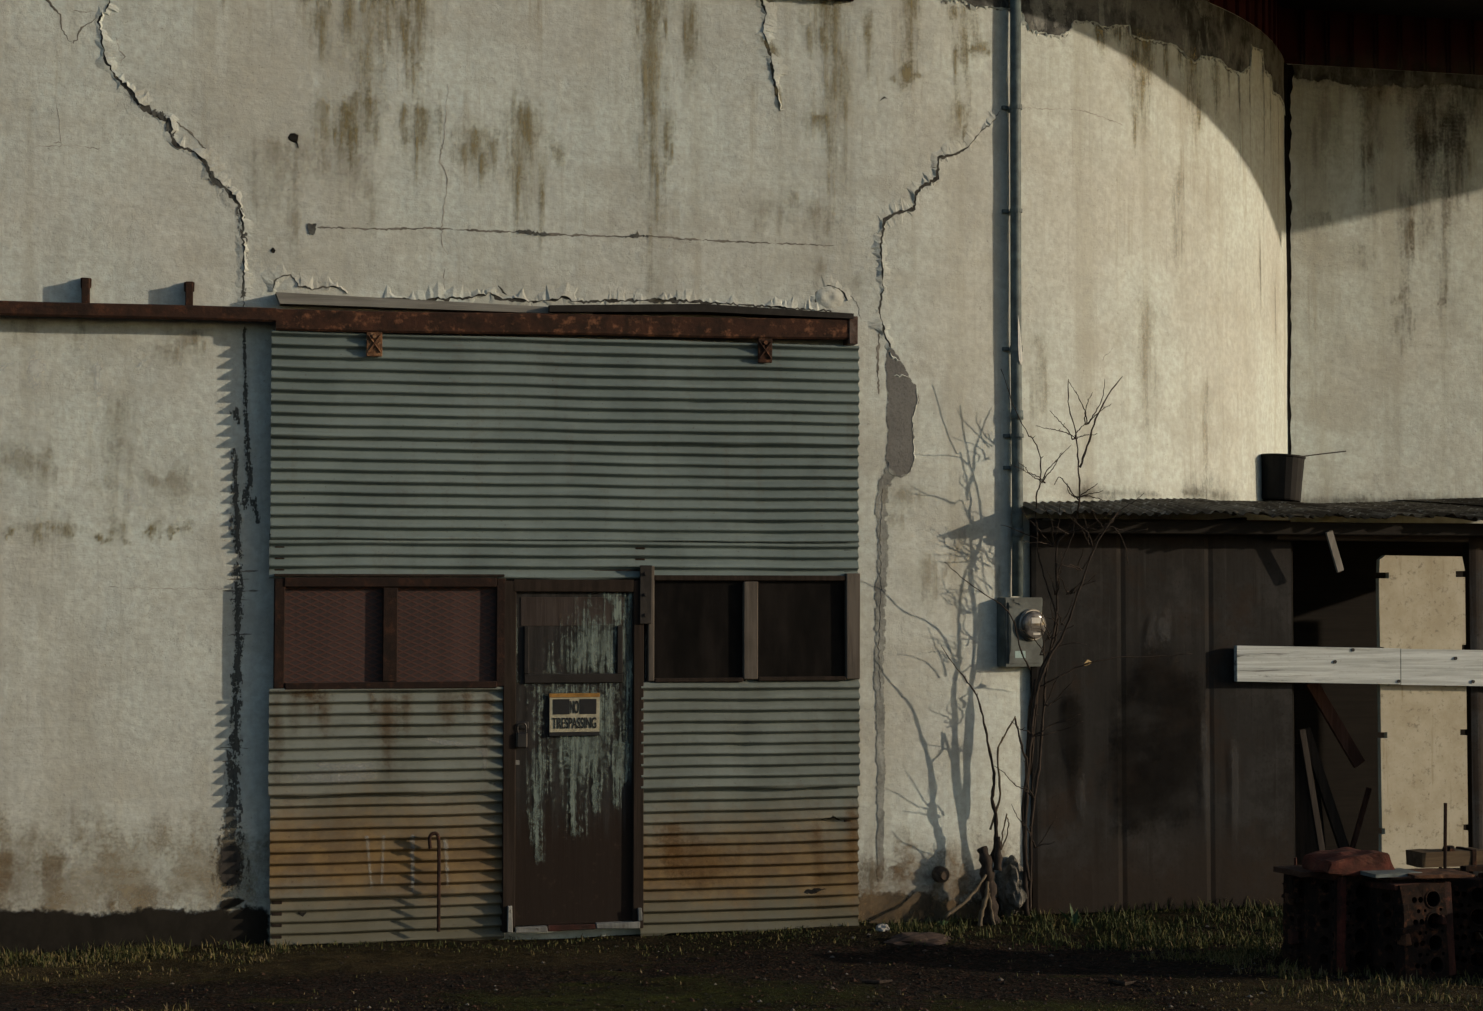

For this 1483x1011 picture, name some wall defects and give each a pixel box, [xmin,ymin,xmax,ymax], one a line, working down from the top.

crack [46,0,348,307]
damp [322,98,372,159]
damp [344,0,425,78]
damp [402,107,427,162]
damp [462,105,533,219]
damp [643,0,694,206]
spalling [940,0,1483,115]
crack [307,86,1122,394]
peeling [527,592,633,861]
damp [0,824,269,954]
corrosion [428,832,441,932]